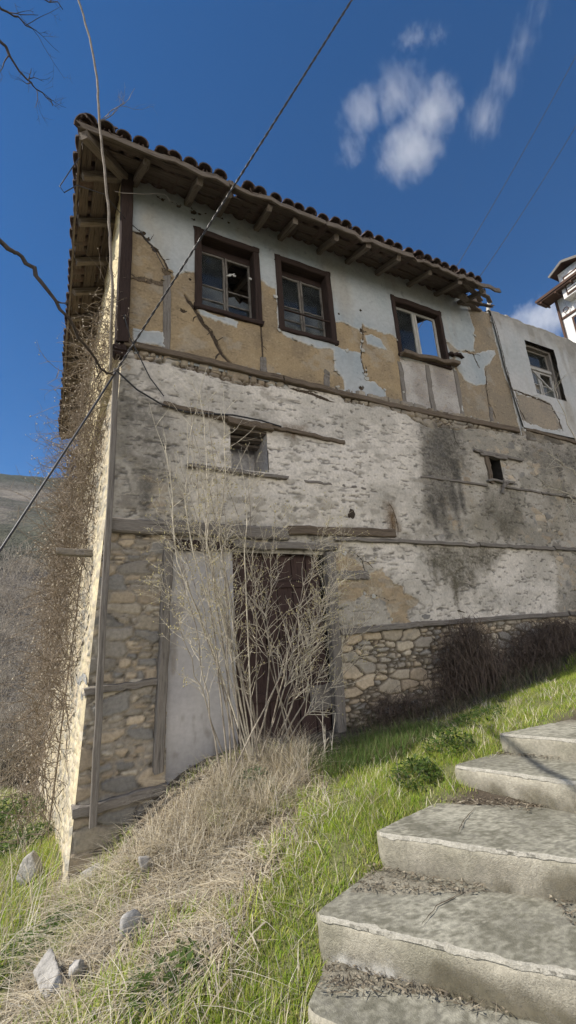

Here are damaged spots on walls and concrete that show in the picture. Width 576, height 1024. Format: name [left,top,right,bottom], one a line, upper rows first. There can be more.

crack [133,231,169,269]
crack [187,300,228,362]
flaking render [129,230,570,445]
water stain [424,535,502,601]